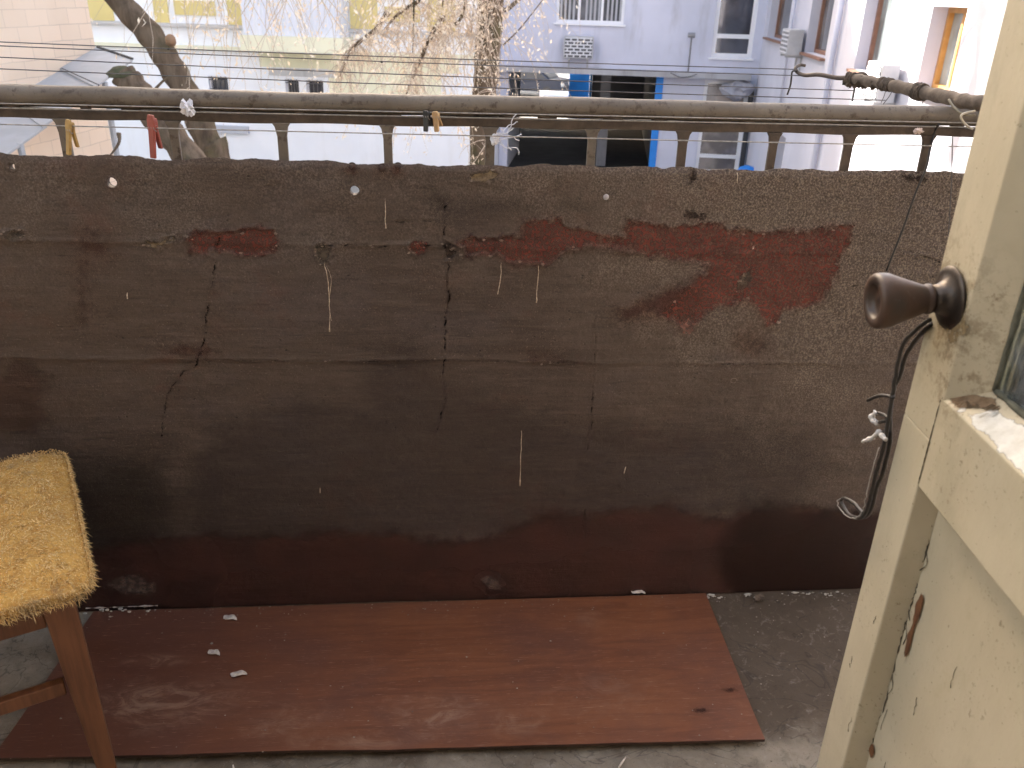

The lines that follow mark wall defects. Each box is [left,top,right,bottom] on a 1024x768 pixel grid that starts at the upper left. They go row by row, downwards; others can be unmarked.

peeling [142,225,278,257]
peeling [441,210,855,330]
crack [415,264,451,373]
peeling [950,394,1024,473]
water stain [727,510,878,592]
peeling [904,593,924,657]